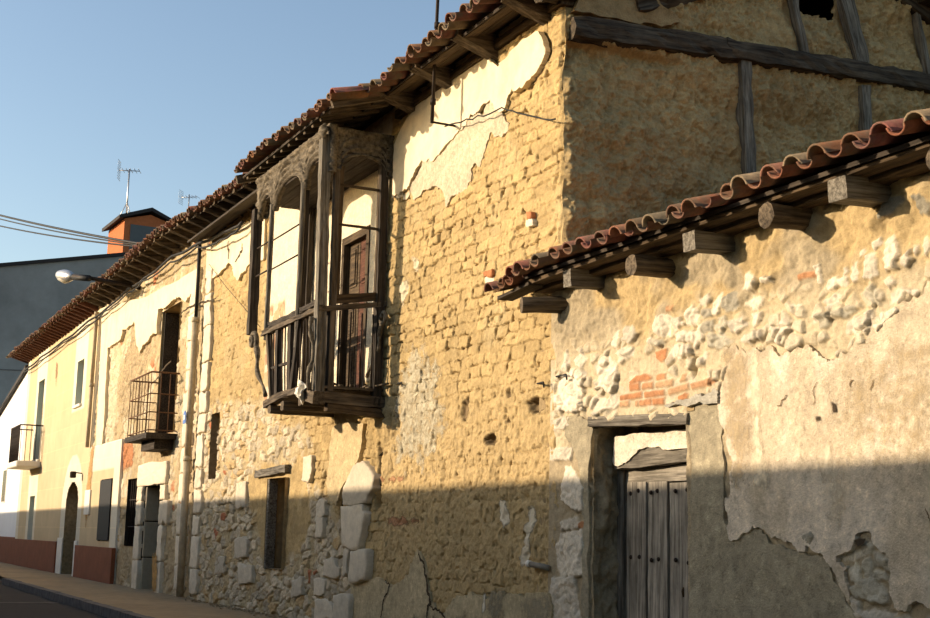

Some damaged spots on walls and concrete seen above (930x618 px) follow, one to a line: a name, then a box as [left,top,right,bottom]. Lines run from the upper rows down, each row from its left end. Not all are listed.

peeling [392,31,550,207]
peeling [261,219,269,261]
peeling [96,221,251,446]
peeling [688,281,930,618]
crack [418,551,445,618]